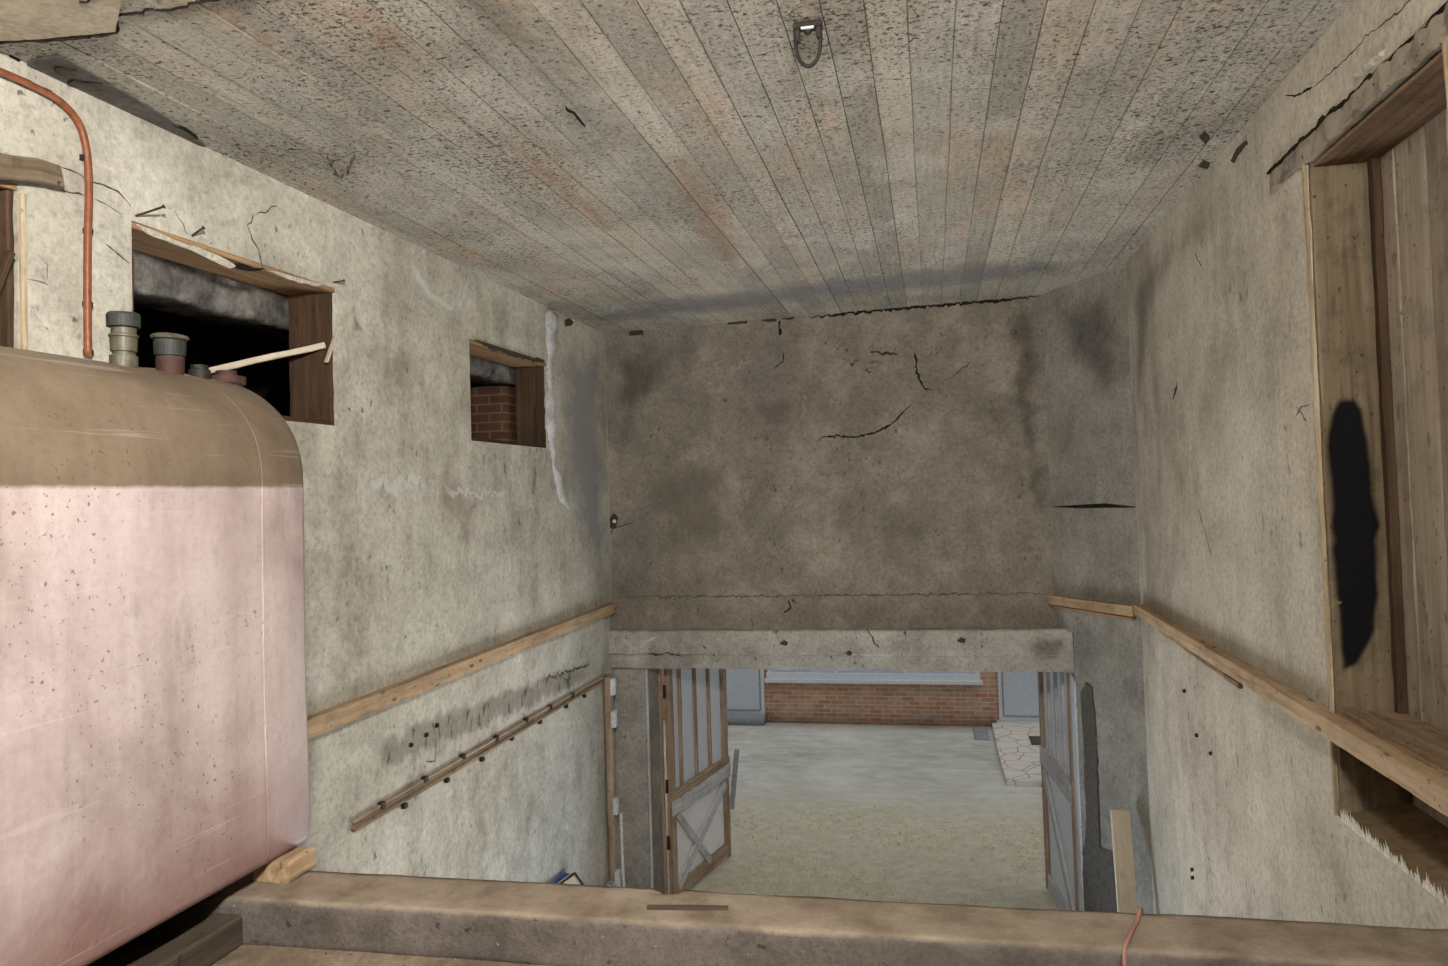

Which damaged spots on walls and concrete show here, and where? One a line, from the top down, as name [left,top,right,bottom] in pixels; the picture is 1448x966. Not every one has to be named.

peeling [0,0,122,44]
crack [247,206,275,274]
crack [775,296,1039,368]
crack [817,351,971,442]
crack [1054,501,1135,509]